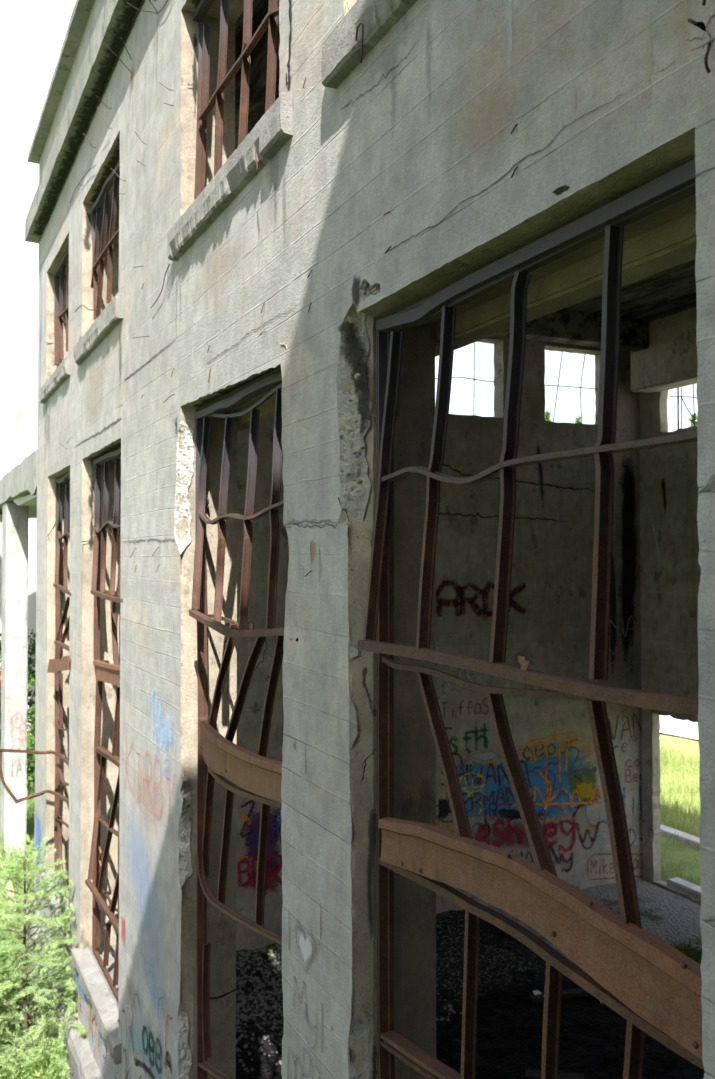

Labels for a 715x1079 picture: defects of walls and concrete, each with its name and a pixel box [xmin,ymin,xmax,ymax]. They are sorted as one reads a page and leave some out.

crack [341,37,419,109]
crack [653,14,715,74]
crack [387,94,624,252]
spalling [283,277,381,525]
spalling [174,416,194,554]
crack [287,521,337,529]
spalling [348,1016,371,1079]